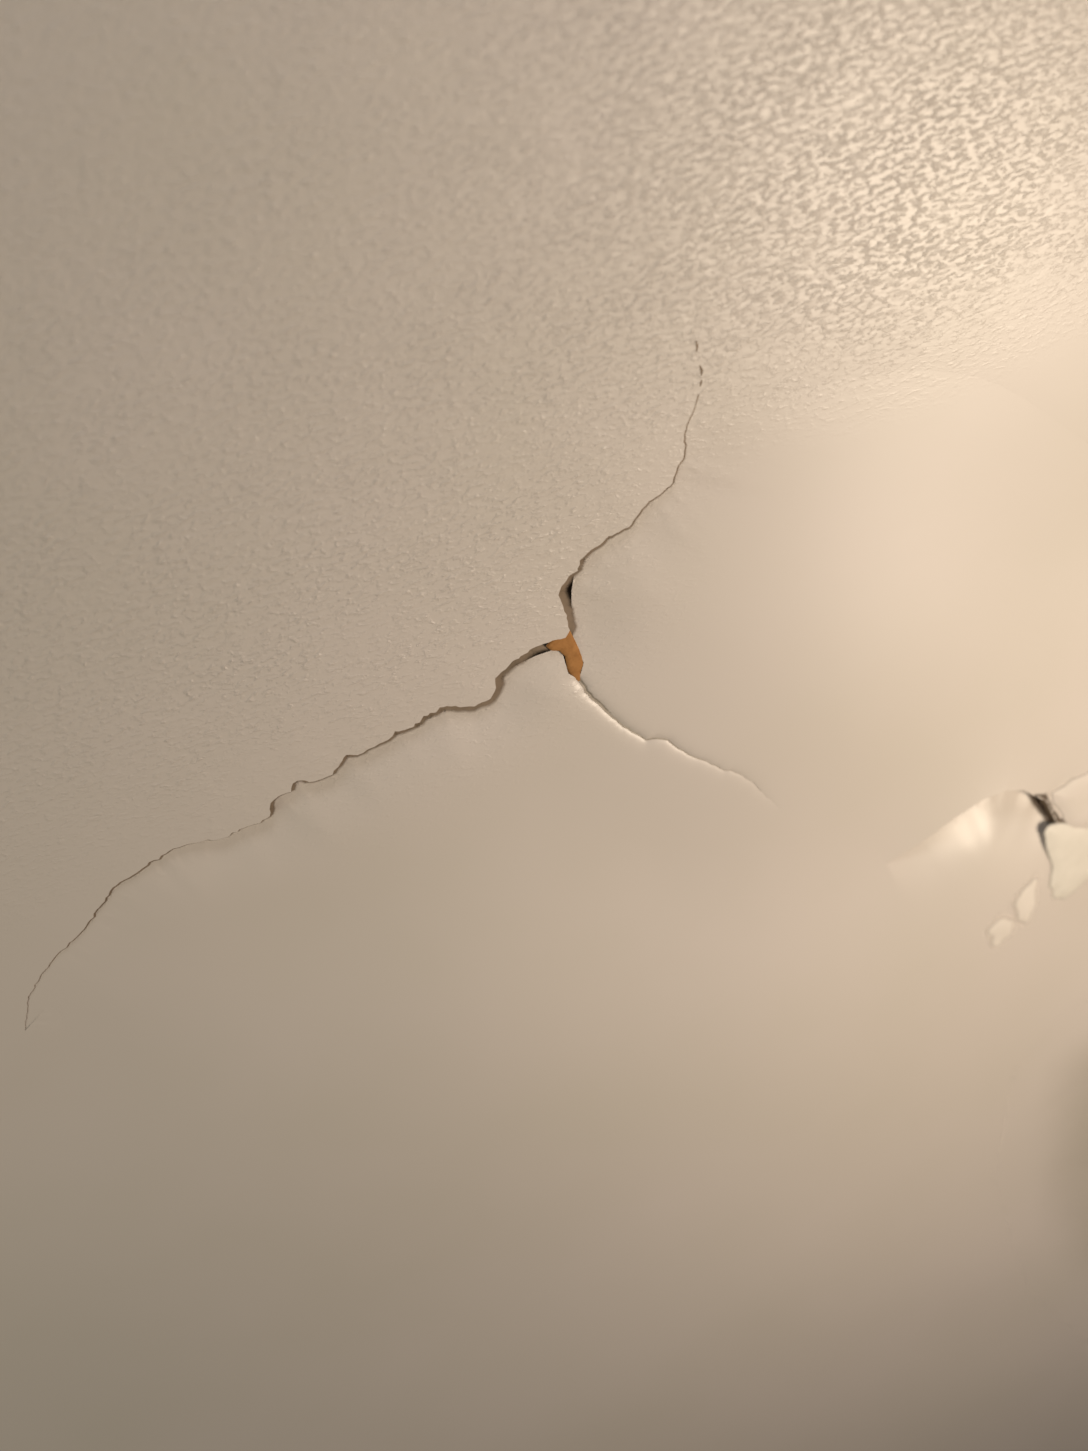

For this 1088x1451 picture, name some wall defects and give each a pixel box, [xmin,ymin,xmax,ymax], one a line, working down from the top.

crack [230,341,746,835]
crack [25,844,187,1029]
flaking render [988,823,1088,946]